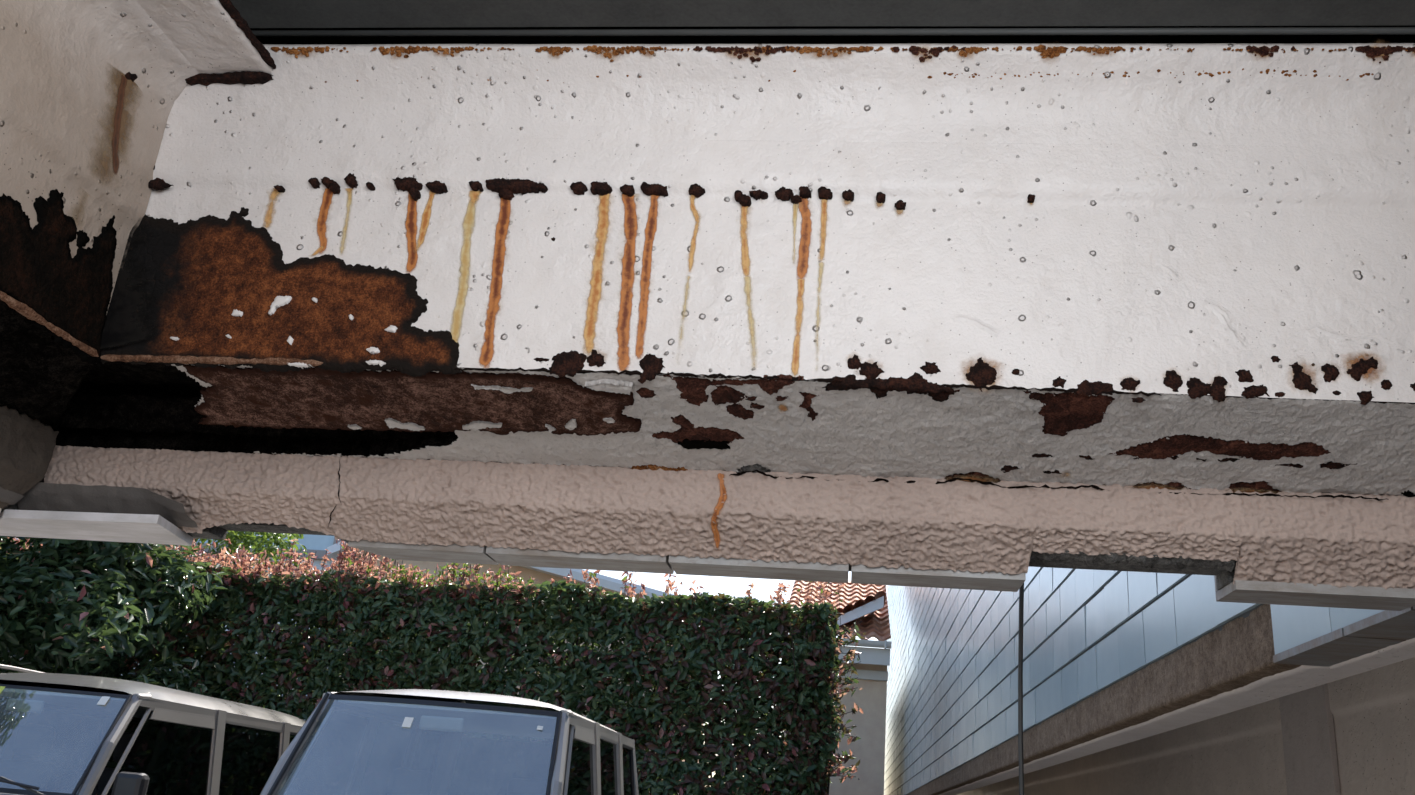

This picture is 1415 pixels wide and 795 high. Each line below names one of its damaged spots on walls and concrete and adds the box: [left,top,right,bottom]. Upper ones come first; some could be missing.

rust [535,44,1195,80]
peeling [0,291,323,366]
rust [0,173,669,436]
rust [734,186,854,376]
rust [847,354,884,380]
rust [964,357,1019,392]
rust [1163,354,1392,405]
spalling [55,394,446,441]
peeling [635,372,960,450]
peeling [1023,380,1115,436]
peeling [1000,453,1069,476]
peeling [1079,434,1357,469]